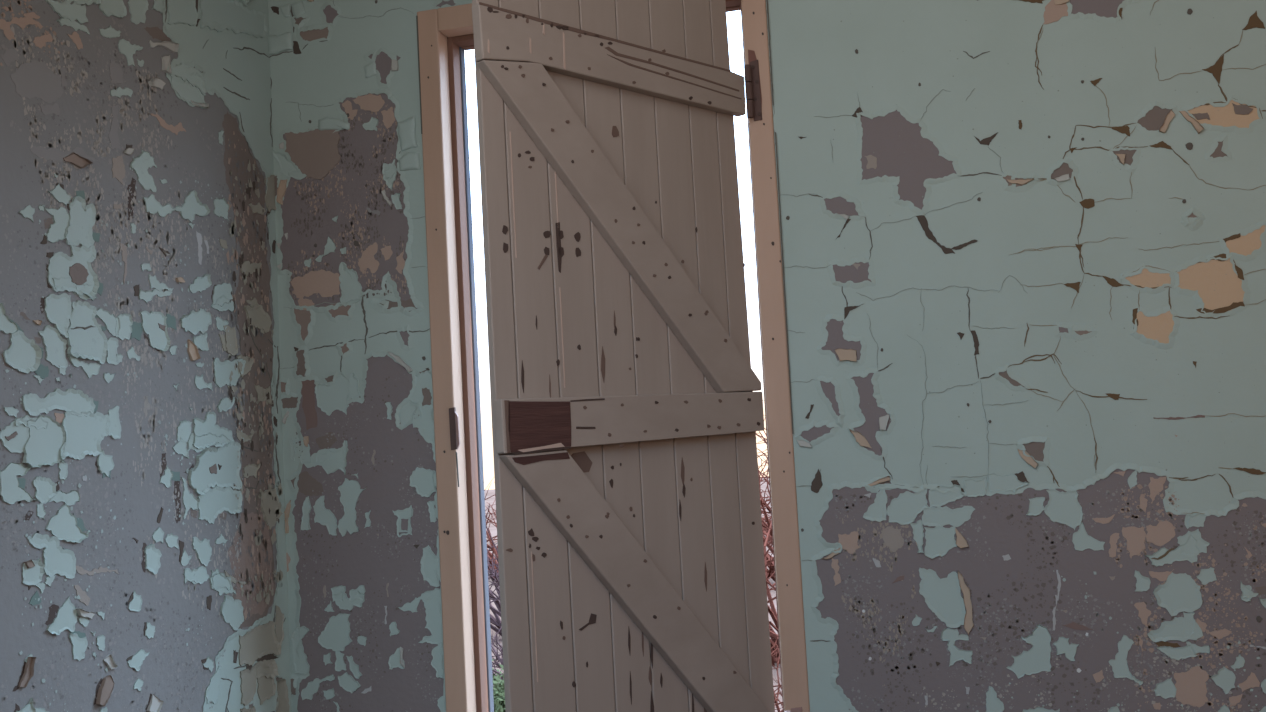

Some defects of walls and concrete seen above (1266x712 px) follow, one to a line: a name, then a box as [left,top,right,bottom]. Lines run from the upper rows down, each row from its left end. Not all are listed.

crack [605,46,742,99]
peeling [1066,0,1142,24]
peeling [819,104,961,221]
crack [766,0,1266,493]
peeling [1120,220,1266,350]
peeling [0,0,449,712]
peeling [789,314,896,461]
peeling [1016,436,1051,468]
peeling [801,463,1266,712]